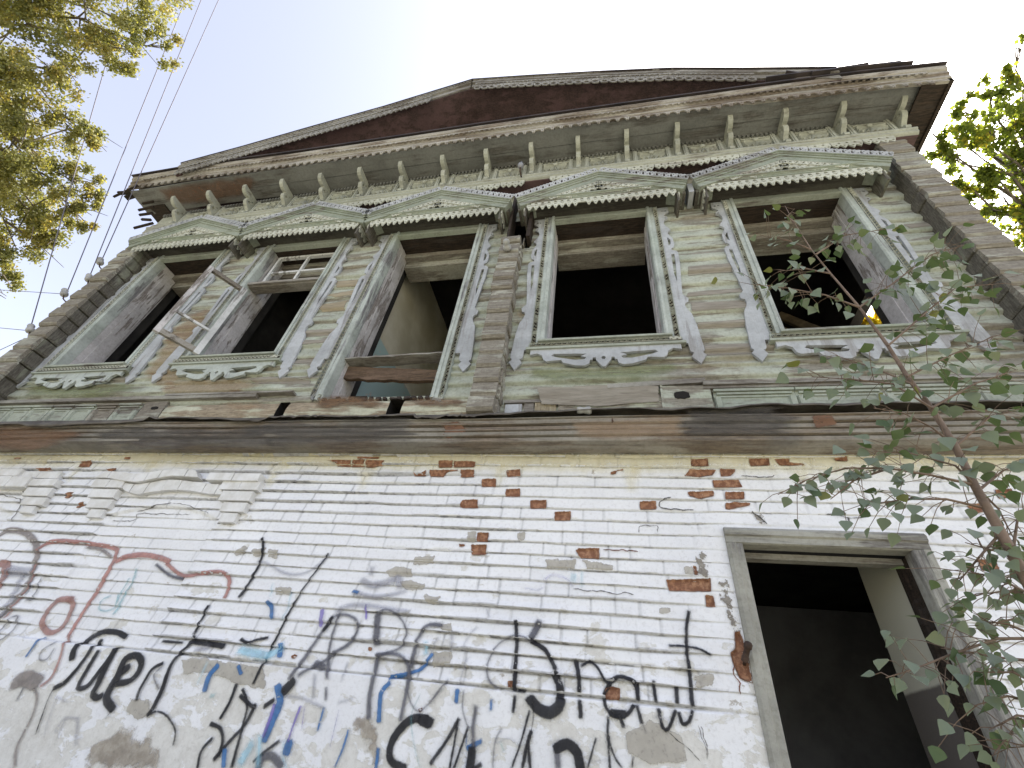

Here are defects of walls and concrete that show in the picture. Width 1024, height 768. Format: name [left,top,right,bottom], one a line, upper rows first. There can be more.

spalling [328,457,384,468]
crack [114,503,221,524]
spalling [414,460,571,521]
spalling [640,501,657,510]
spalling [685,458,764,524]
spalling [459,531,489,555]
spalling [666,552,753,683]
peeling [88,698,159,768]
peeling [626,720,687,764]